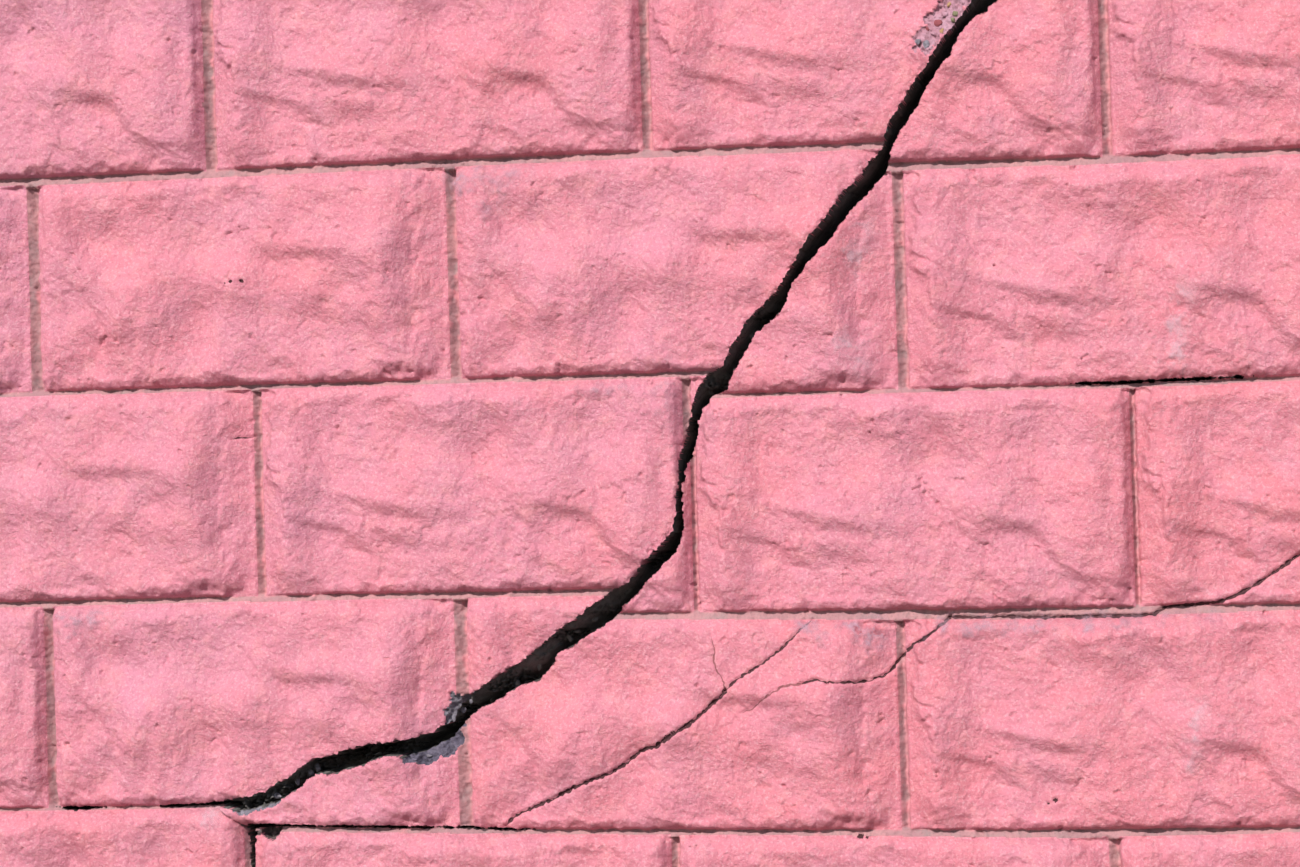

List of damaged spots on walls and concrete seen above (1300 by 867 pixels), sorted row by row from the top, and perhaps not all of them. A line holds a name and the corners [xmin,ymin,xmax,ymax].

spalling [911,0,971,56]
crack [160,0,997,867]
crack [744,554,1300,712]
spalling [402,691,475,765]
crack [56,804,107,812]